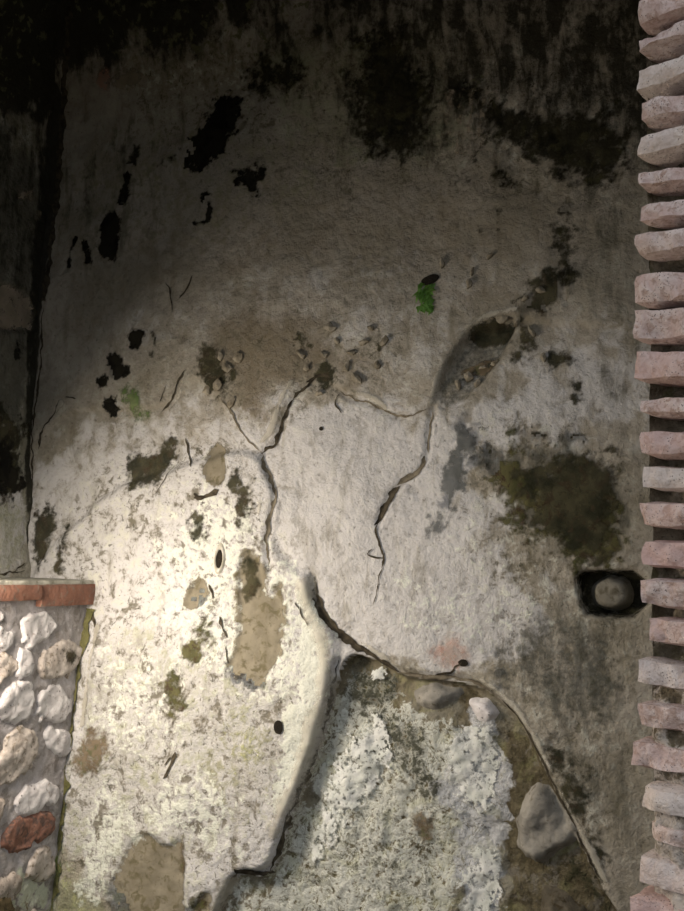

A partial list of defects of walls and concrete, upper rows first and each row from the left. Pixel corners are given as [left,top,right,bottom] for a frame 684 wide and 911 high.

leakage [157,89,248,173]
leakage [231,162,266,197]
leakage [445,79,635,188]
peeling [429,286,546,405]
leakage [0,401,31,505]
crack [194,489,218,500]
crack [221,373,434,604]
crack [208,585,228,663]
spalling [226,548,291,686]
crack [220,578,607,911]